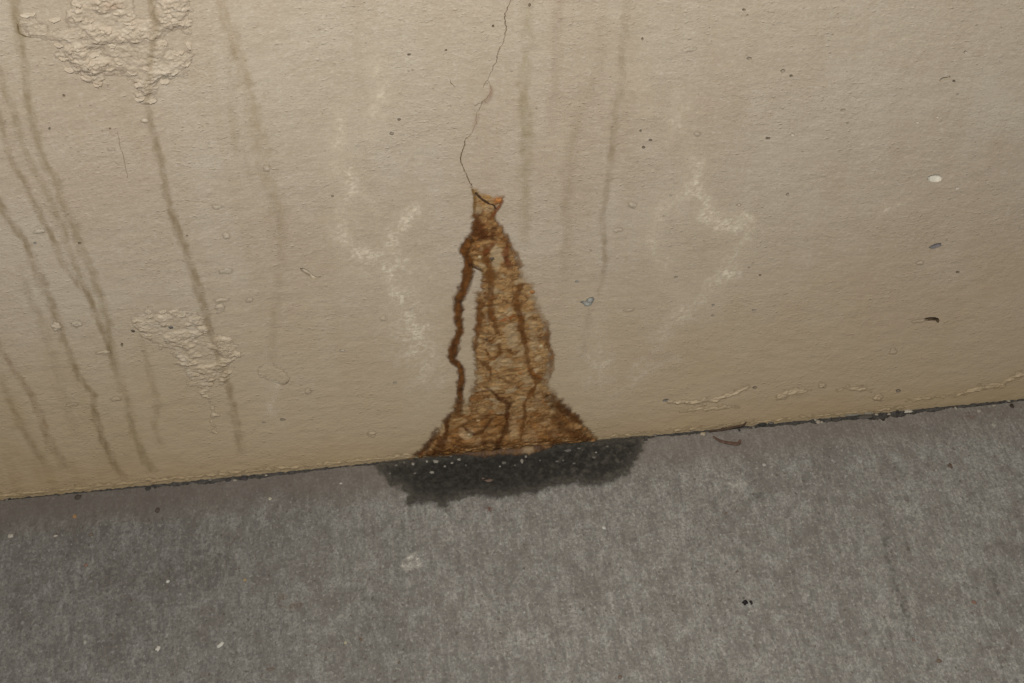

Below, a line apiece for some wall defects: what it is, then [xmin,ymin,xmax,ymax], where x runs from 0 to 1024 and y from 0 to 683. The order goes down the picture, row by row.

crack [460,0,511,186]
corrosion [410,189,597,460]
leakage [376,435,644,511]